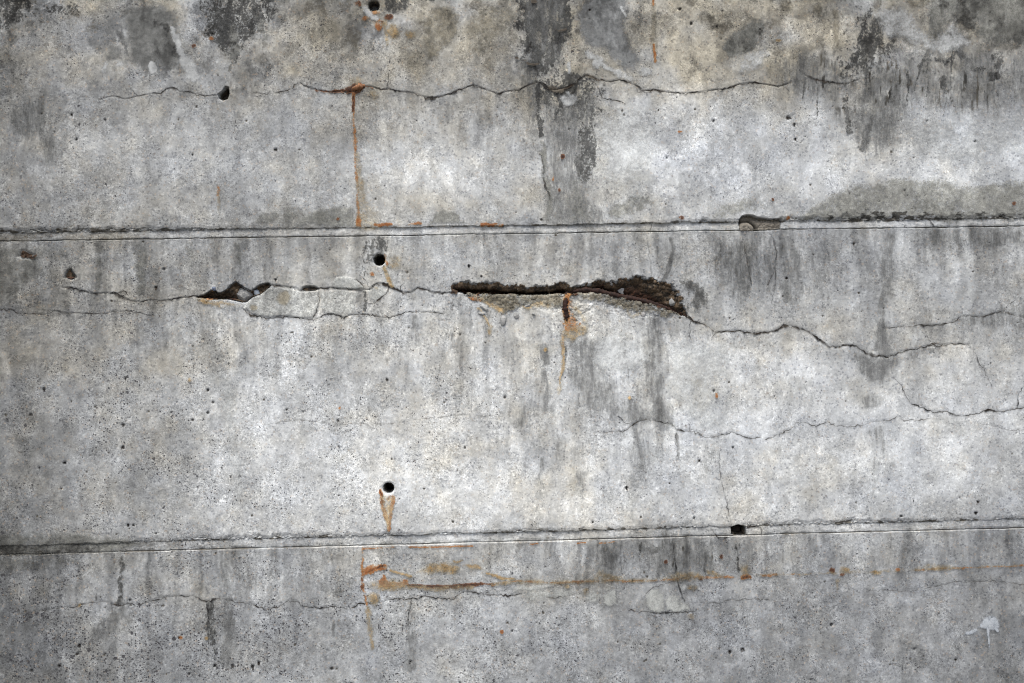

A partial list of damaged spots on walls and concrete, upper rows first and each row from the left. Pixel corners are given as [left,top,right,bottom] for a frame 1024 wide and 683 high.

damp [424,0,657,224]
crack [257,68,857,103]
damp [784,0,1024,156]
rust [315,78,393,229]
damp [798,178,1024,246]
crack [1,280,197,316]
peeling [198,277,383,316]
crack [245,279,451,320]
spalling [451,275,709,331]
crack [604,301,1024,475]
rust [379,489,395,532]
rust [360,545,777,650]